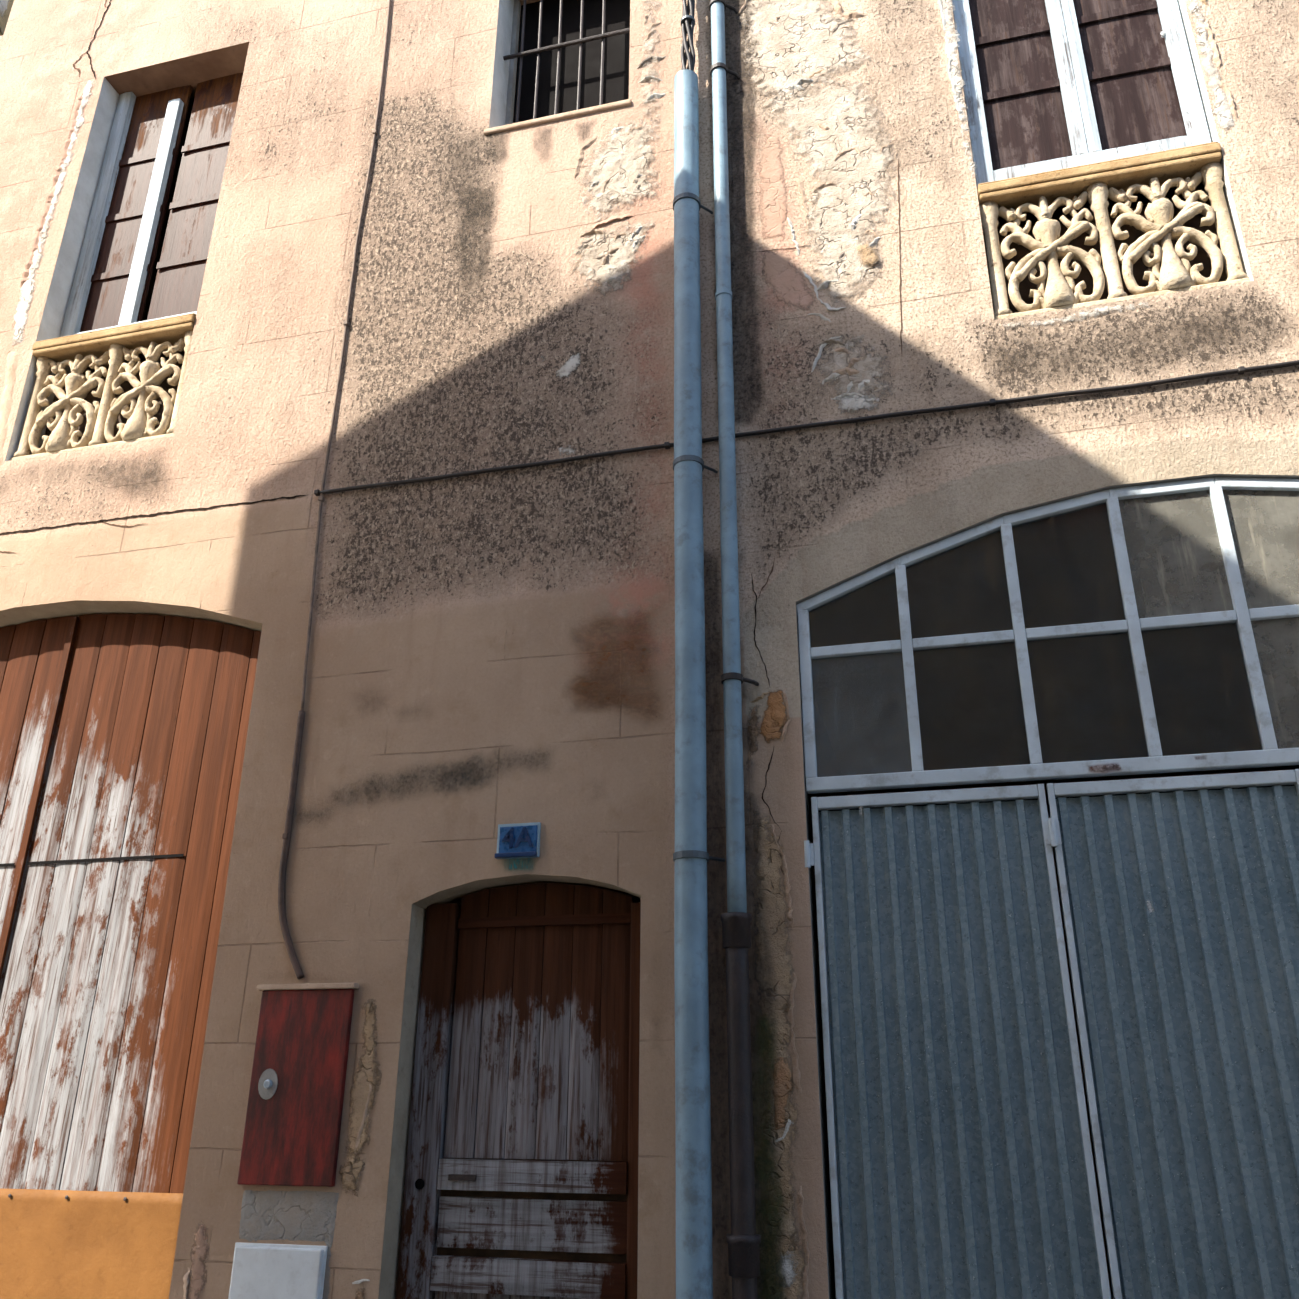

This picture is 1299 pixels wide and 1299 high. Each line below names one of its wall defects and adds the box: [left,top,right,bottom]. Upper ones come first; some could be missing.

peeling [12,80,92,345]
crack [73,0,111,79]
peeling [569,0,666,298]
peeling [739,0,895,414]
peeling [1188,0,1237,128]
crack [751,558,775,686]
spalling [746,688,791,764]
crack [762,748,784,875]
spalling [340,999,381,1196]
spalling [753,811,809,1299]